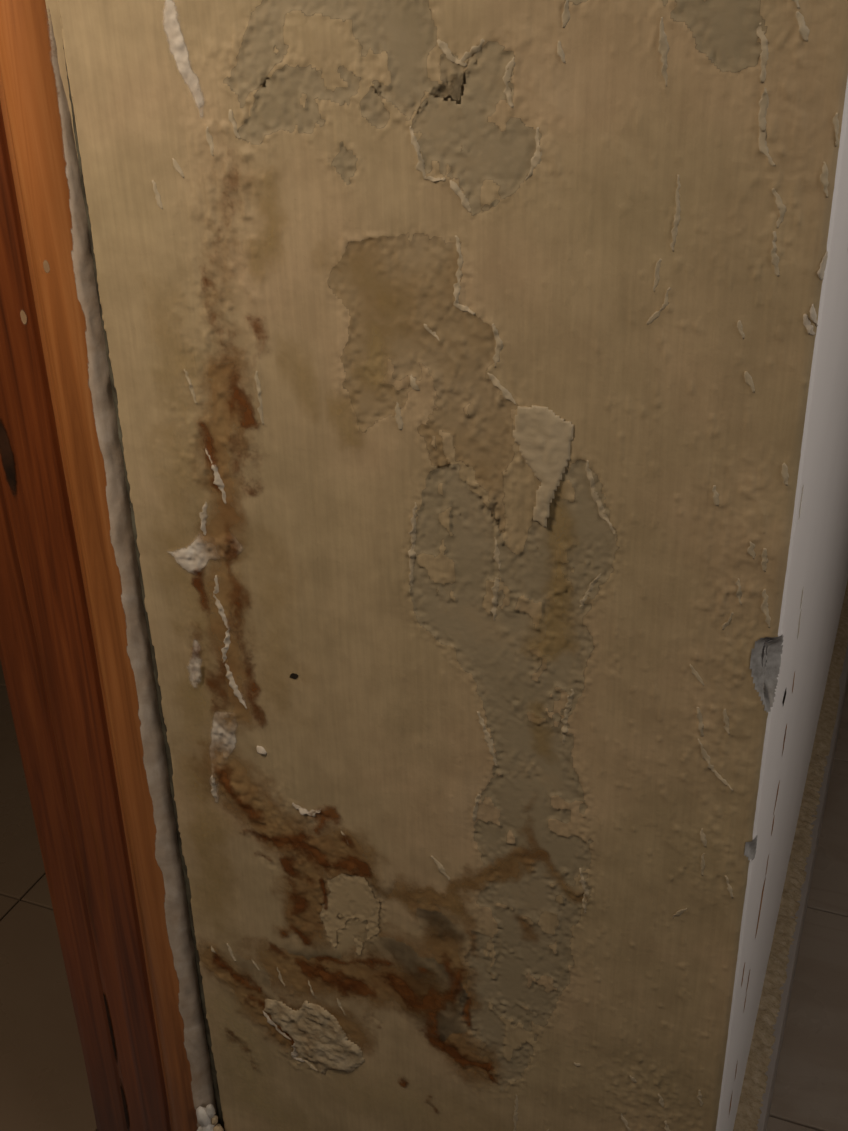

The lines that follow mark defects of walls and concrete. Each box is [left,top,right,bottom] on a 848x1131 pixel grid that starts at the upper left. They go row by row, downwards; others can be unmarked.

peeling [223,0,542,216]
peeling [658,0,775,166]
peeling [328,233,574,533]
peeling [205,449,226,504]
rust [192,357,265,726]
peeling [213,575,247,709]
flaking render [750,589,786,713]
peeling [292,803,321,817]
peeling [320,874,380,955]
rust [198,747,584,1082]
flaking render [263,980,364,1074]